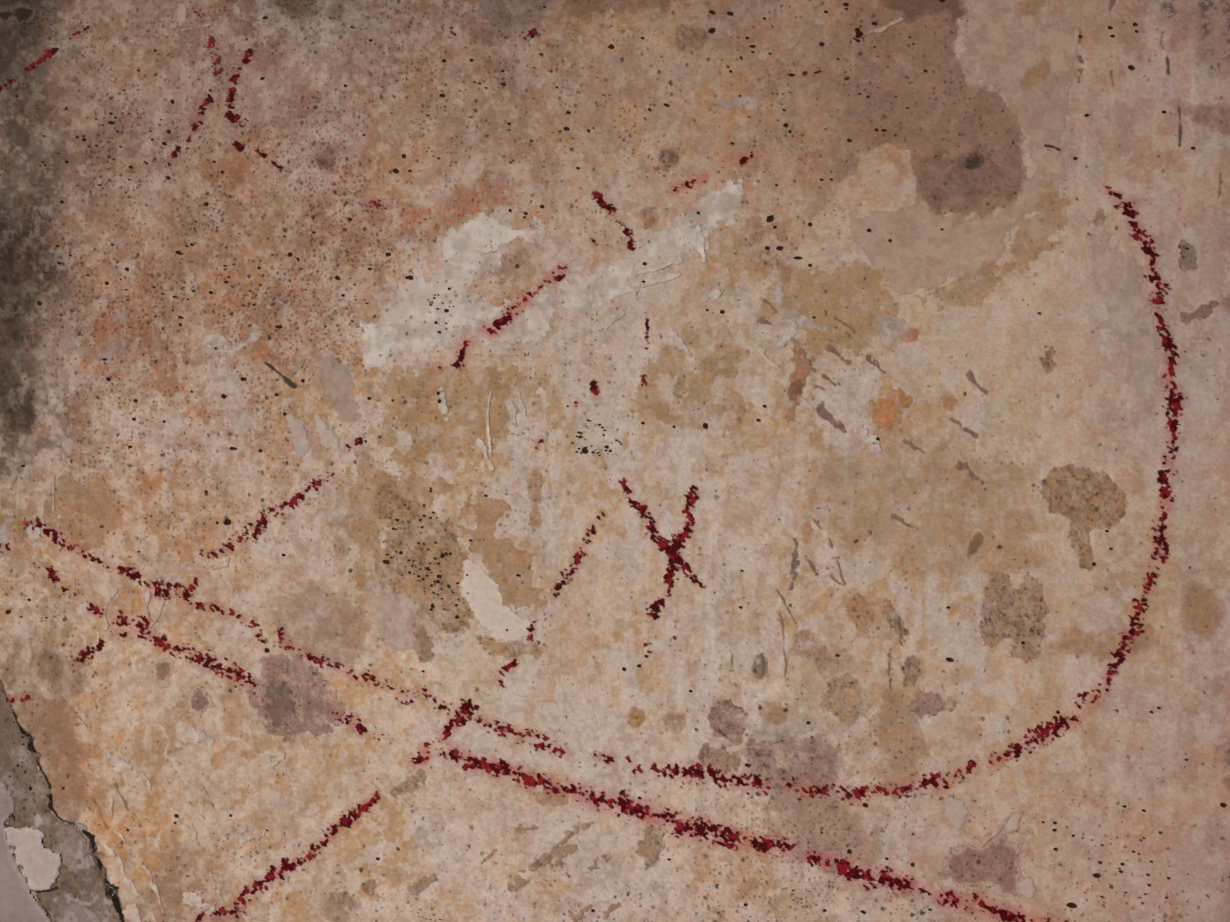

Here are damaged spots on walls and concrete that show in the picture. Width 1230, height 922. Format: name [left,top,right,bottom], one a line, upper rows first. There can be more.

spalling [0,680,121,922]